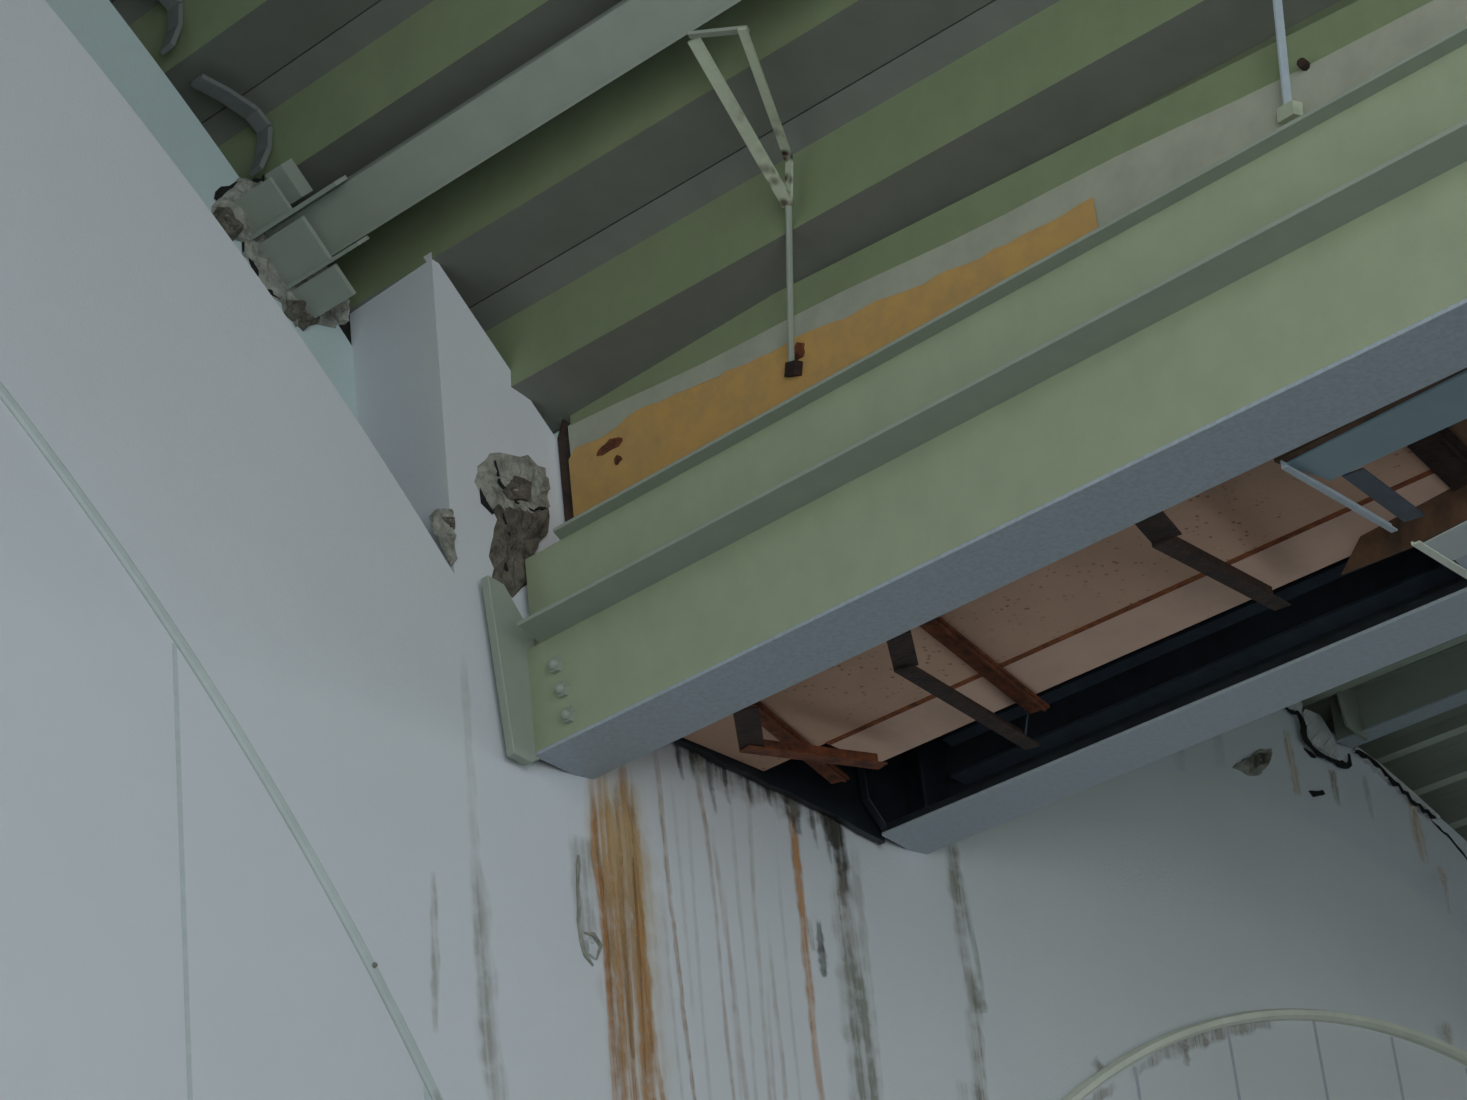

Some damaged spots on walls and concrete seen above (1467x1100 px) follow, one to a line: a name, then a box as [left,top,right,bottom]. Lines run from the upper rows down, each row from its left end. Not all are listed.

spalling [211,175,350,331]
spalling [474,452,550,598]
rust [591,784,665,1100]
rust [790,800,808,952]
leakage [826,817,848,897]
spalling [1232,748,1272,776]
crack [1285,707,1467,860]
leakage [845,948,878,1100]